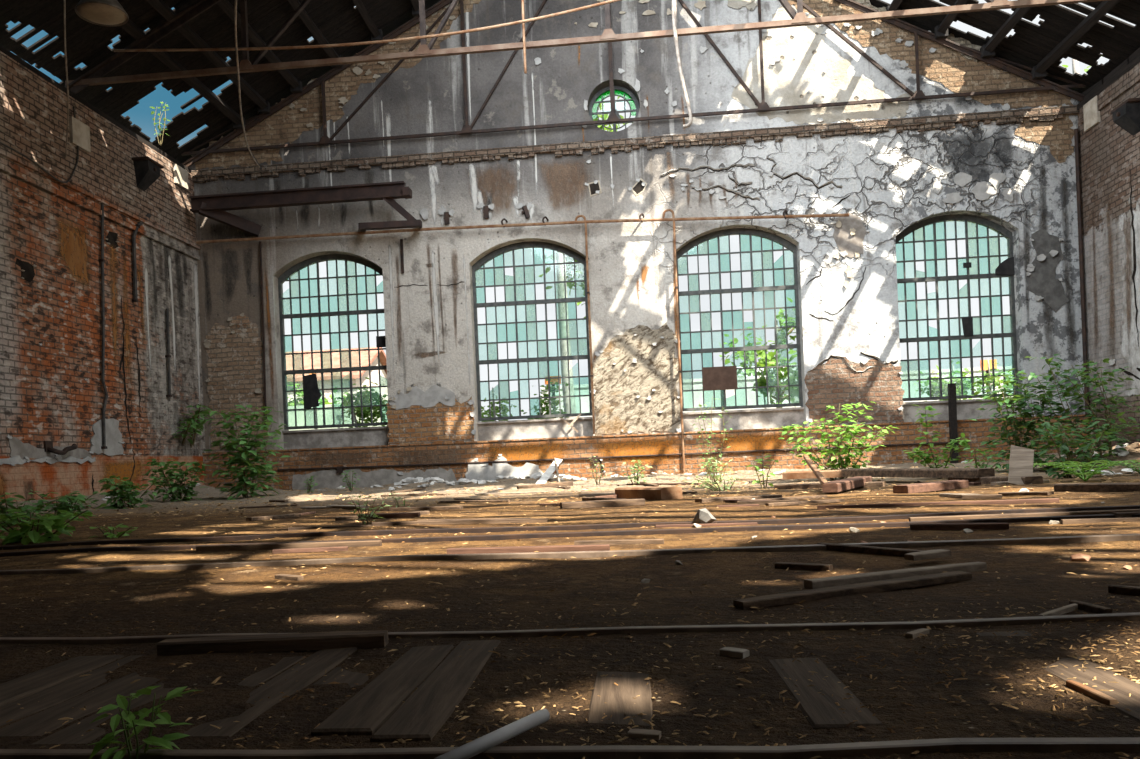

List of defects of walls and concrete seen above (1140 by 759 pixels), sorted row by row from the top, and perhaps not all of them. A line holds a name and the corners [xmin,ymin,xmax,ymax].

flaking render [15,258,37,282]
flaking render [106,231,119,249]
crack [810,267,866,321]
water stain [1024,168,1047,309]
water stain [1044,303,1053,344]
water stain [1063,181,1075,354]
water stain [1093,205,1131,346]
flaking render [0,418,125,466]
flaking render [386,384,476,445]
flaking render [590,323,684,436]
flaking render [804,351,905,426]